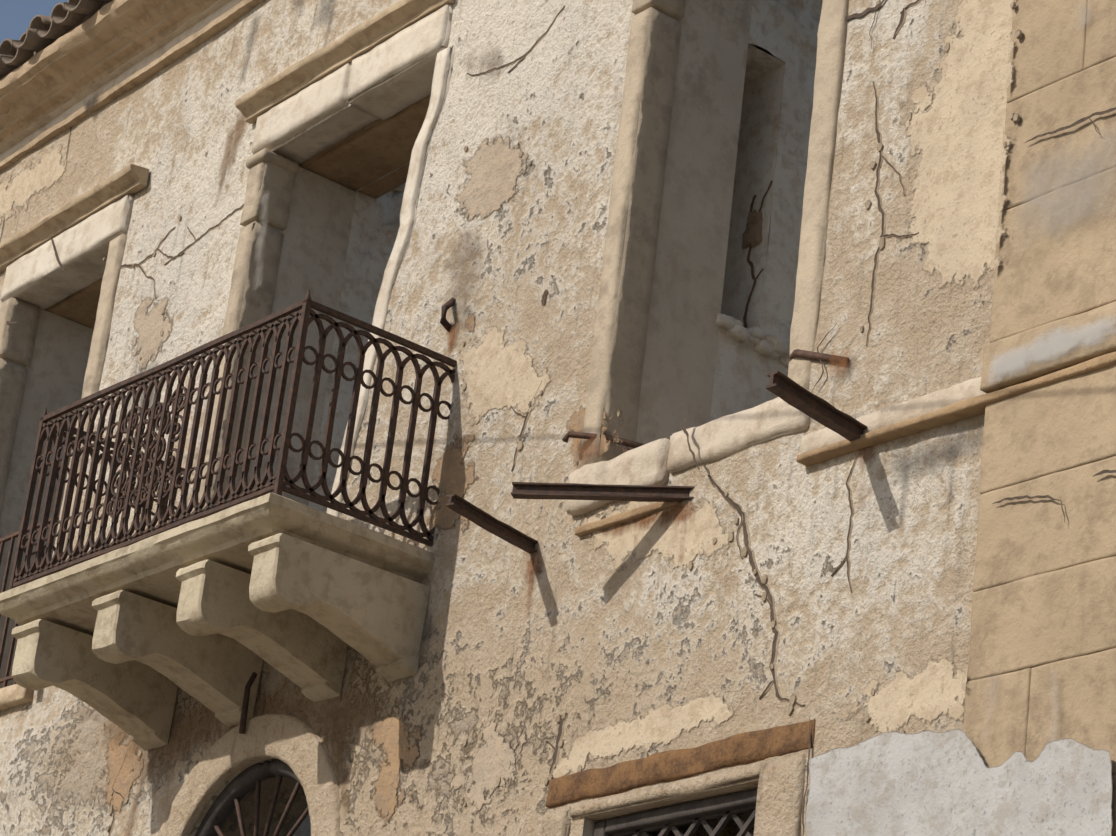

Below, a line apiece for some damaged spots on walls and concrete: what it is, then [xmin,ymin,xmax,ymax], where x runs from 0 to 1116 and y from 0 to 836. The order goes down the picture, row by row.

crack [467,5,565,76]
crack [846,0,922,49]
spalling [454,127,532,221]
peeling [893,0,1023,289]
spalling [128,296,173,370]
crack [103,204,244,298]
crack [743,245,764,328]
crack [811,81,919,393]
crack [831,456,858,593]
crack [992,495,1065,522]
crack [682,407,811,835]
spalling [370,707,422,826]